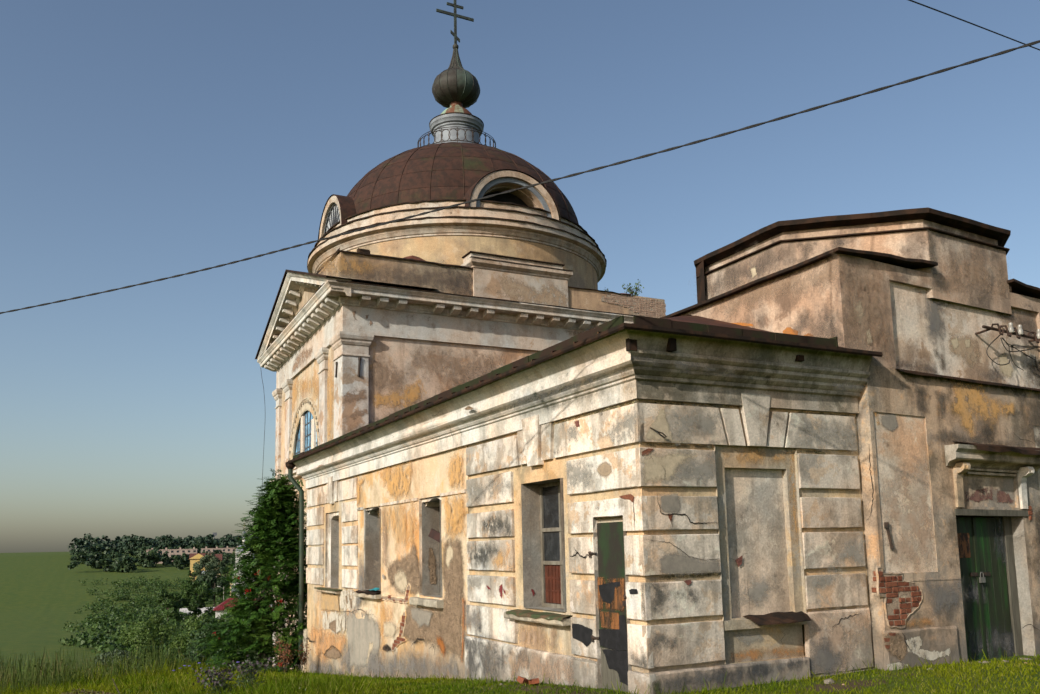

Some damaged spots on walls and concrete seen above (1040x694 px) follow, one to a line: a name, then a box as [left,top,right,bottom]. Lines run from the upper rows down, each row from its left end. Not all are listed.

crack [633,469,747,560]
peeling [965,486,1014,503]
flaking render [379,453,464,656]
flaking render [311,588,360,660]
damp [309,607,555,677]